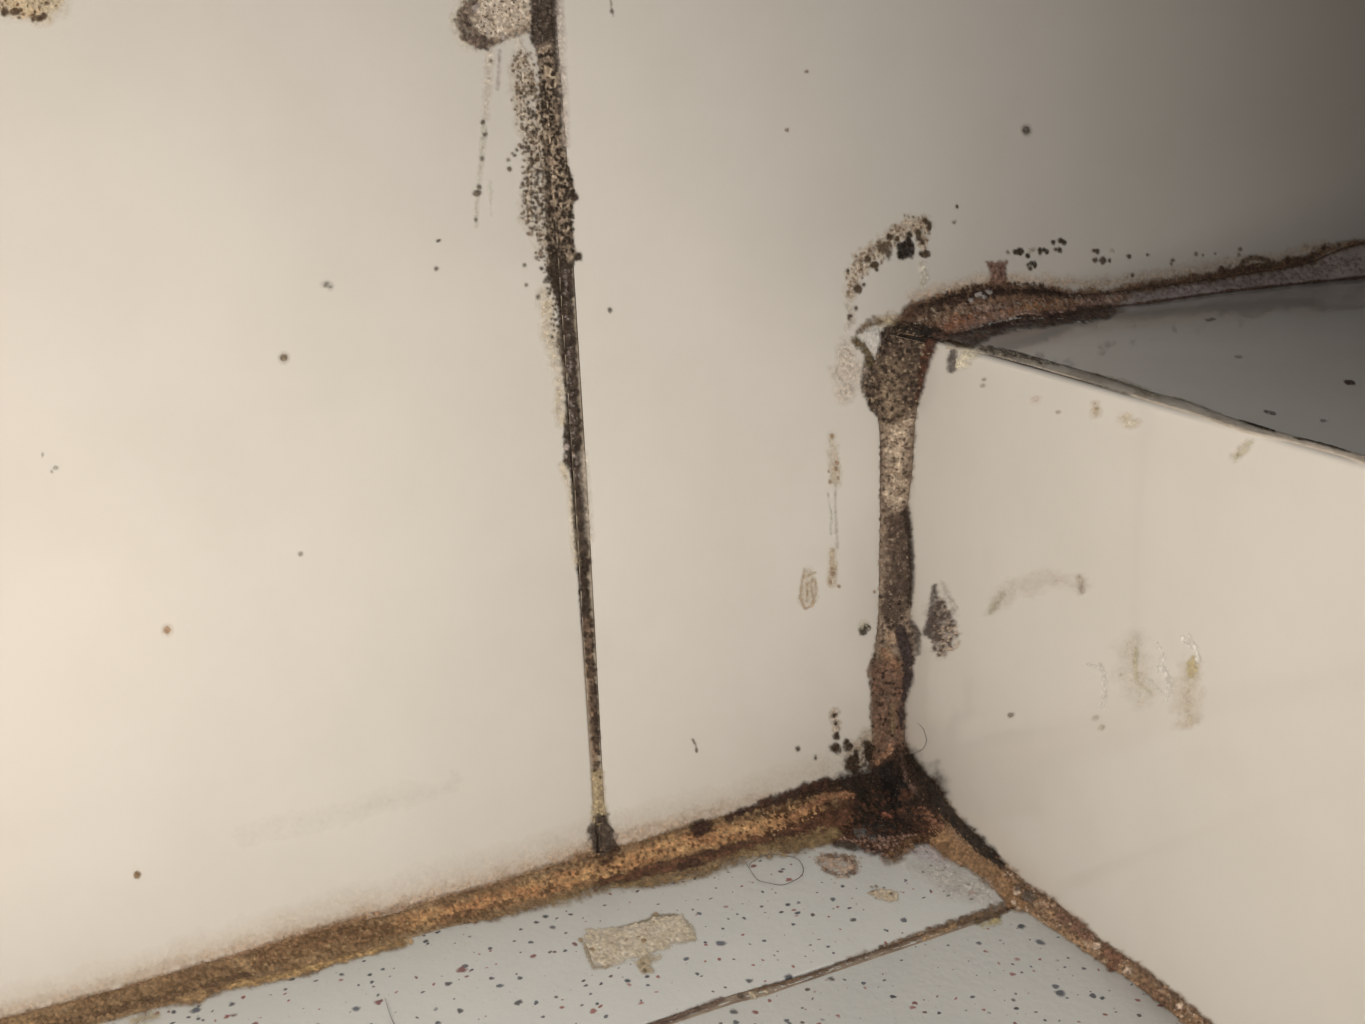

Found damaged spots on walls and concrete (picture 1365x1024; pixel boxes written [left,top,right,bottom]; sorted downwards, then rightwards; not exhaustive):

mould [0,0,61,22]
leakage [837,216,1066,425]
leakage [453,0,620,856]